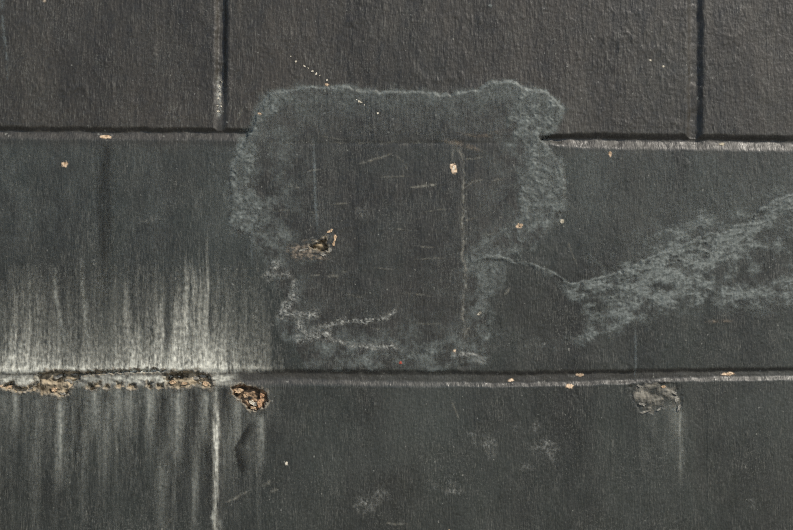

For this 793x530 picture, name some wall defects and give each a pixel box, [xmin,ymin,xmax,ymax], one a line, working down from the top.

spalling [292,229,337,259]
water stain [0,306,265,425]
spalling [0,367,215,399]
spalling [230,382,270,412]
spalling [630,382,681,414]
water stain [49,394,62,450]